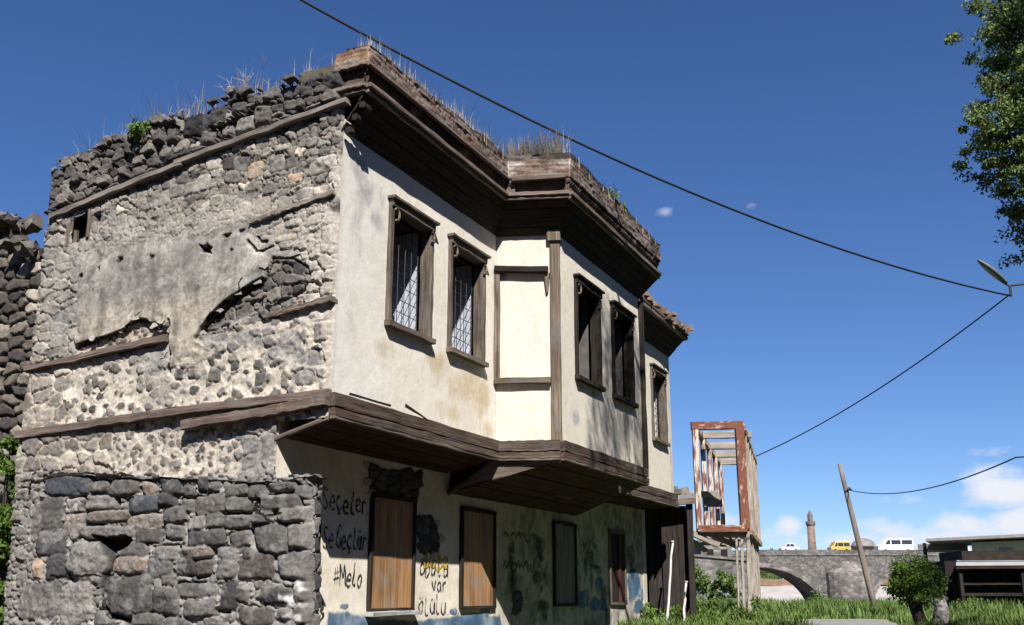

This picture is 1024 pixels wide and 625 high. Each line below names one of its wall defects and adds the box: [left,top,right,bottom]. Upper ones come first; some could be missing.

spalling [199,251,313,336]
spalling [78,316,169,353]
spalling [364,461,424,499]
spalling [416,514,446,559]